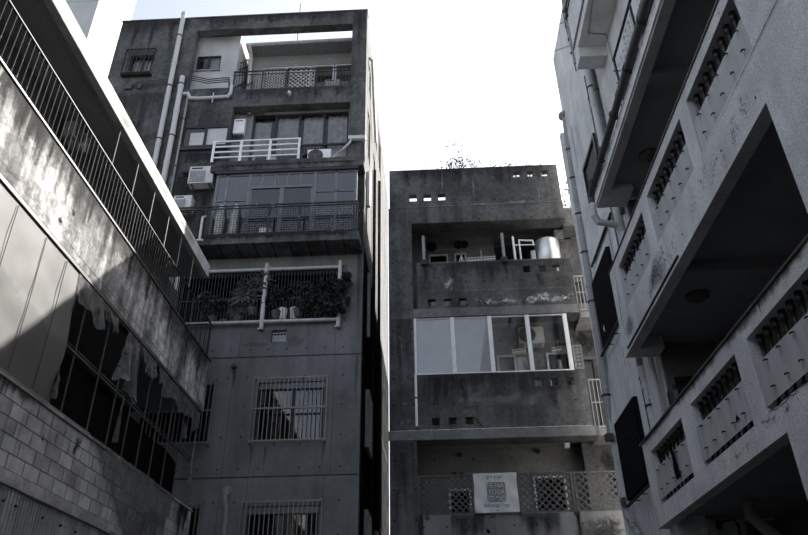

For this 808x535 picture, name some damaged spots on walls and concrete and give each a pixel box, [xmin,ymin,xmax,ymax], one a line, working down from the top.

water stain [0,63,211,371]
water stain [577,515,619,535]